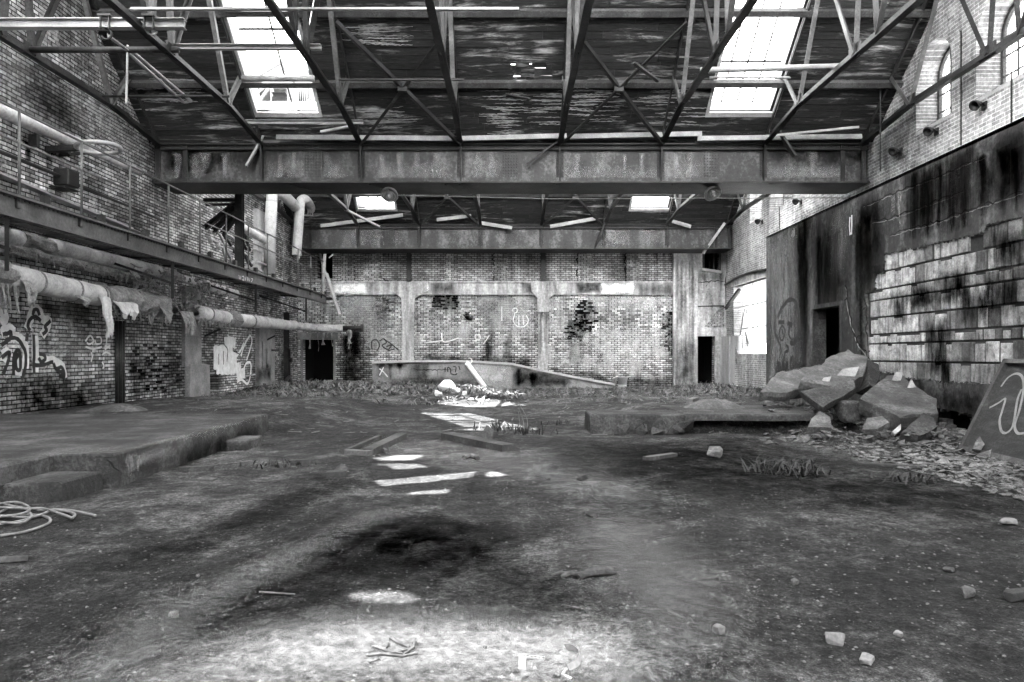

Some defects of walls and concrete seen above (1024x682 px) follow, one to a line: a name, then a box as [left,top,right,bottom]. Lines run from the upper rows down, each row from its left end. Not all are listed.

leakage [905,132,1024,233]
spalling [432,296,473,321]
spalling [564,300,599,341]
flaking render [864,216,1024,386]
spalling [129,341,182,392]